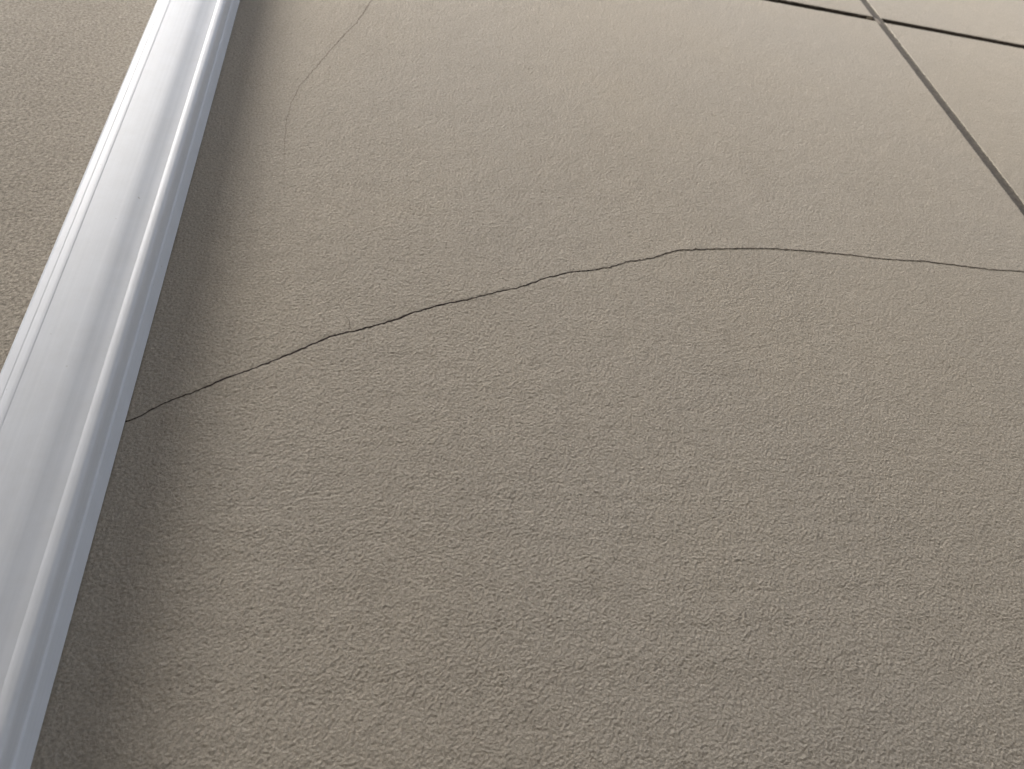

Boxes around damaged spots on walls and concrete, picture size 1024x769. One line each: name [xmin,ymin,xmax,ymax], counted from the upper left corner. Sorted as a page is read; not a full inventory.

crack [125,248,1023,422]